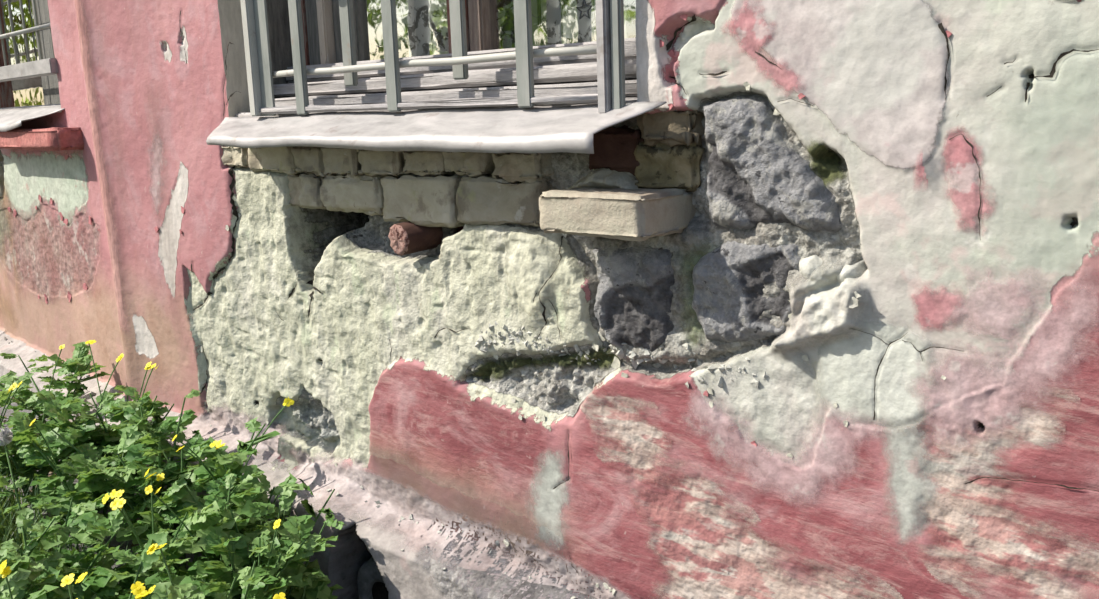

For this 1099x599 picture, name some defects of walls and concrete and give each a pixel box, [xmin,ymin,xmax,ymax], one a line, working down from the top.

crack [938,23,950,100]
crack [987,49,1099,102]
peeling [132,314,159,359]
peeling [150,137,188,298]
crack [530,236,564,347]
peeling [176,0,1099,545]
crack [854,329,961,420]
crack [949,134,981,240]
peeling [290,449,629,599]
peeling [580,368,903,599]
peeling [918,407,1099,599]
crack [965,477,1099,492]